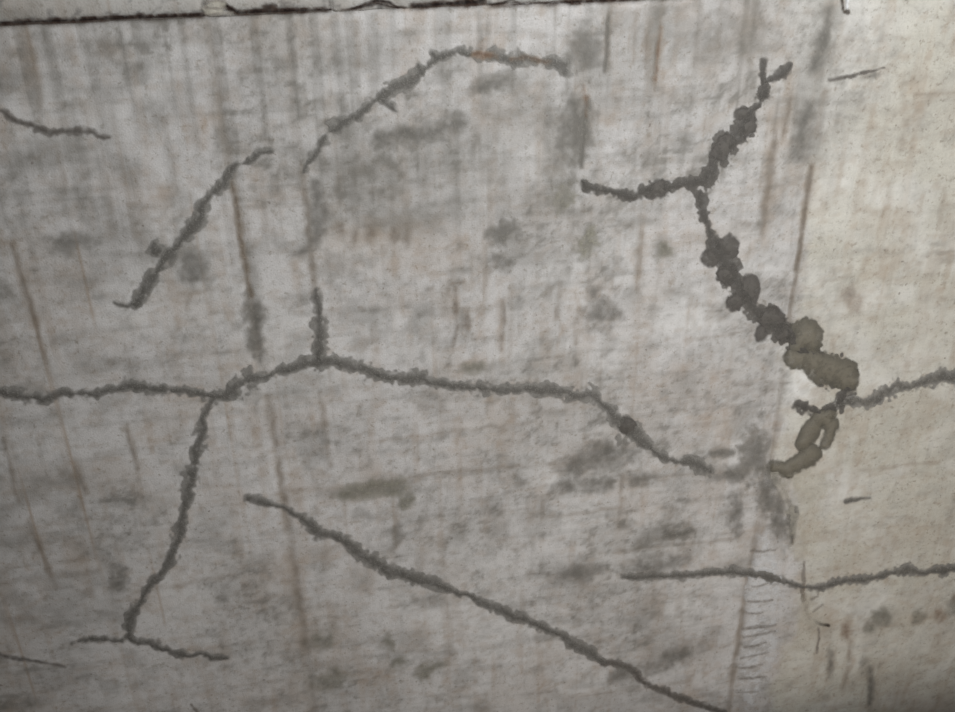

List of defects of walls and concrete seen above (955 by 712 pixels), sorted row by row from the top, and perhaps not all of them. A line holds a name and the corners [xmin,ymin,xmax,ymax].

crack [0,109,111,139]
crack [303,45,570,173]
crack [114,148,274,310]
crack [581,58,955,478]
crack [0,288,714,661]
crack [1,655,58,665]
crack [244,494,727,712]
crack [621,563,955,651]